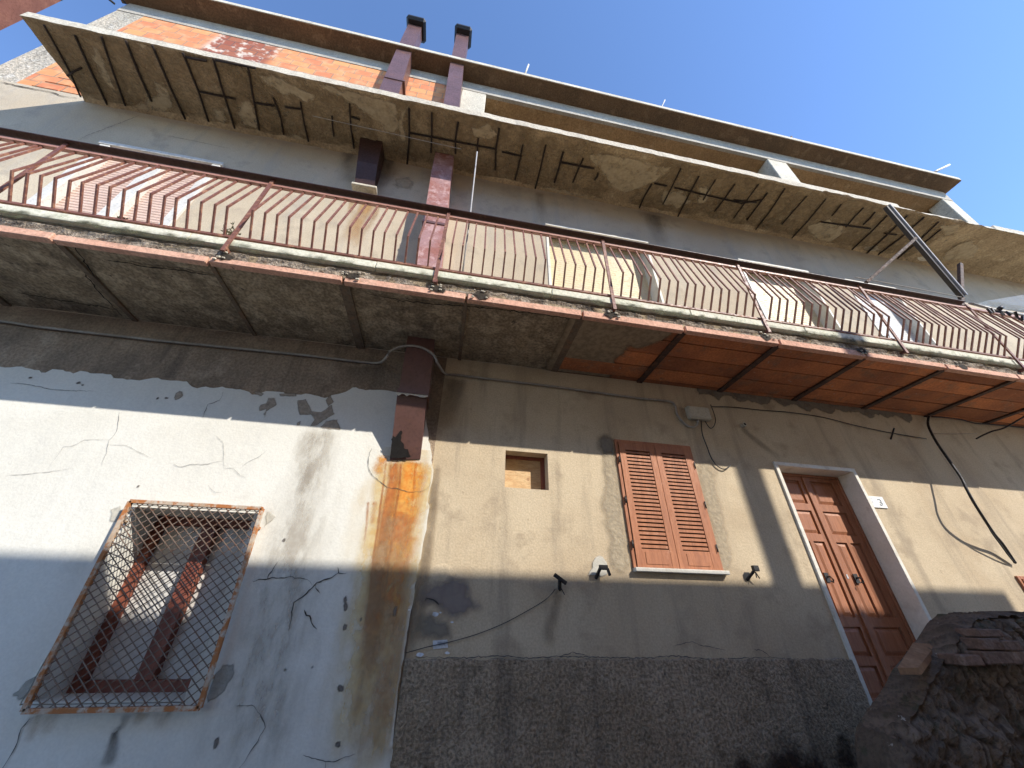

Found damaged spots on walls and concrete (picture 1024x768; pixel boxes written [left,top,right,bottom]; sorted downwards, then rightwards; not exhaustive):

spalling [32,24,978,261]
peeling [255,392,340,430]
crack [253,562,346,628]
rust [349,457,431,747]